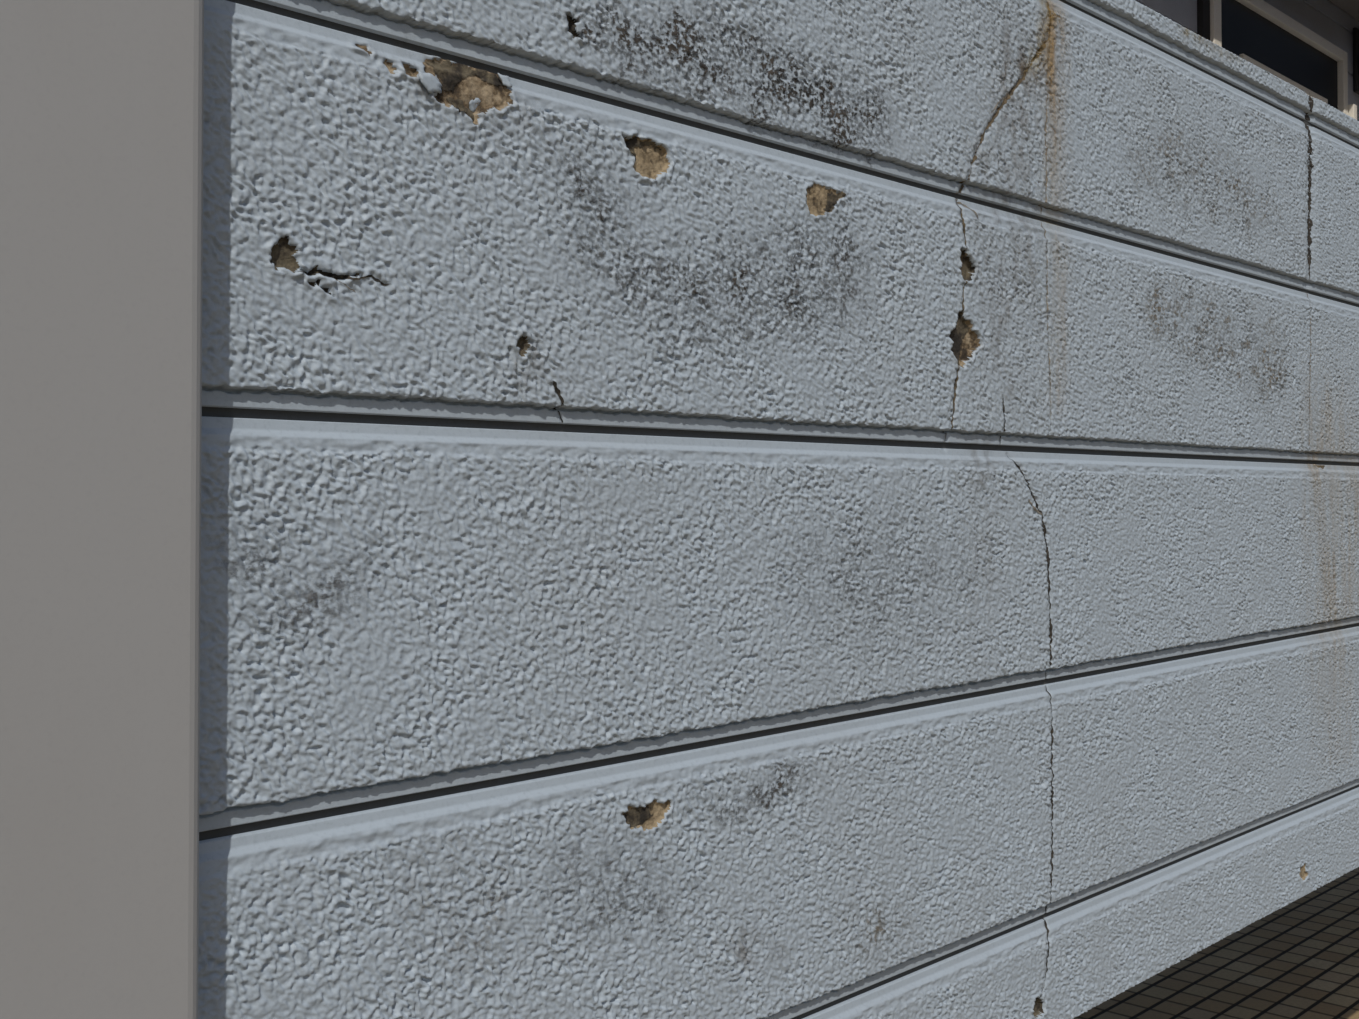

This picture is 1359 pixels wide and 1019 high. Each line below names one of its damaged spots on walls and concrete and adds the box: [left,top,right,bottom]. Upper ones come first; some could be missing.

spalling [355,44,513,125]
damp [569,7,885,160]
spalling [622,134,670,179]
spalling [806,183,846,216]
crack [956,2,1052,416]
crack [295,270,391,292]
spalling [960,249,975,281]
crack [1305,92,1314,445]
spalling [949,312,980,368]
crack [943,365,960,437]
crack [997,398,1054,998]
spalling [622,800,671,831]